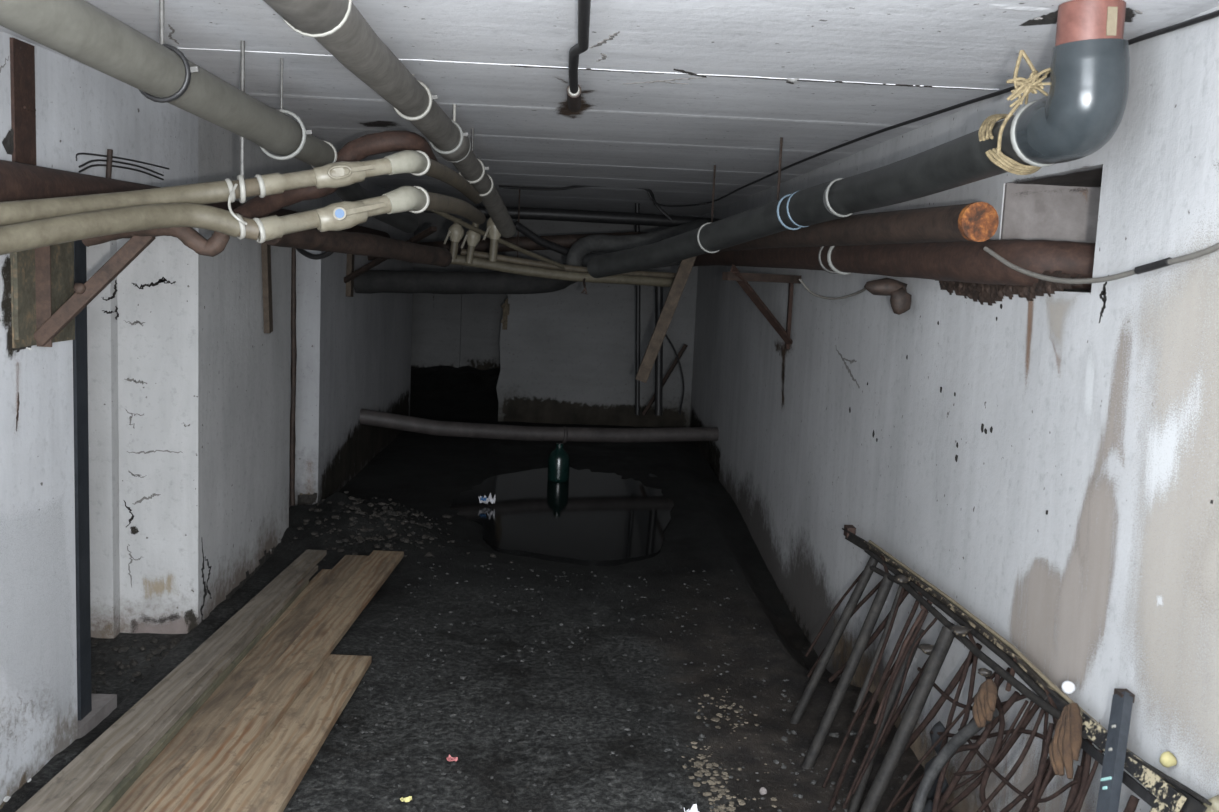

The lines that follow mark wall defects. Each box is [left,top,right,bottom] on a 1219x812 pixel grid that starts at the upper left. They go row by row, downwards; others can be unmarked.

crack [102,277,176,327]
crack [1099,275,1109,323]
crack [124,378,183,587]
leakage [1005,161,1219,795]
crack [200,537,212,621]
leakage [910,706,1077,812]